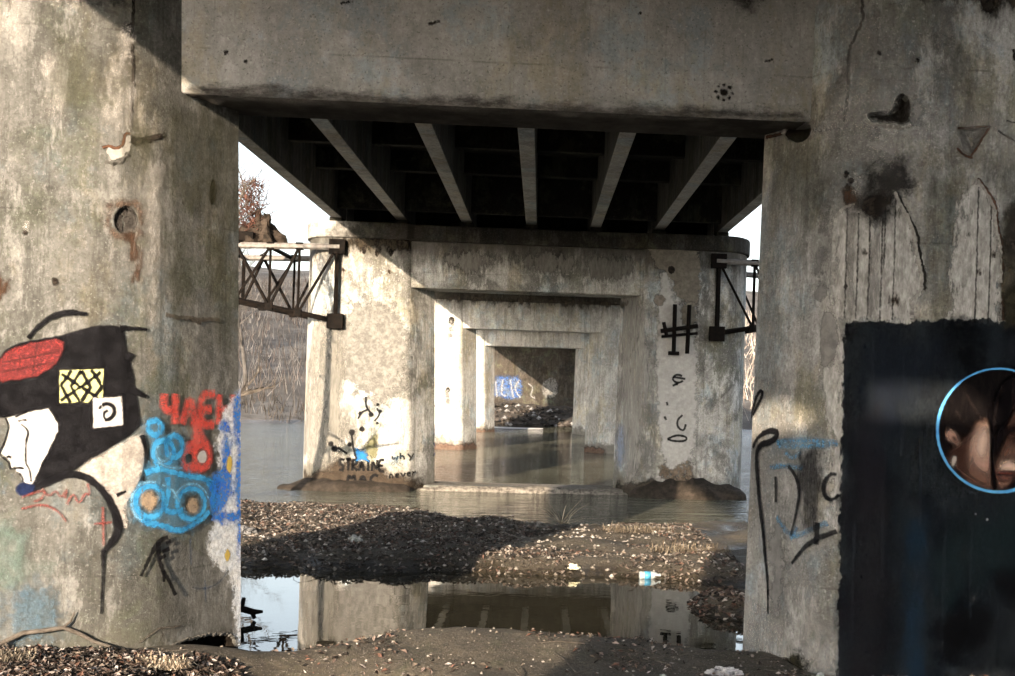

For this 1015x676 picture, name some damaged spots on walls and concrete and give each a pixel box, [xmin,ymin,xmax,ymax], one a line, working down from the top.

spalling [102,132,165,166]
crack [843,0,867,122]
spalling [863,93,925,139]
flaking render [945,178,1005,324]